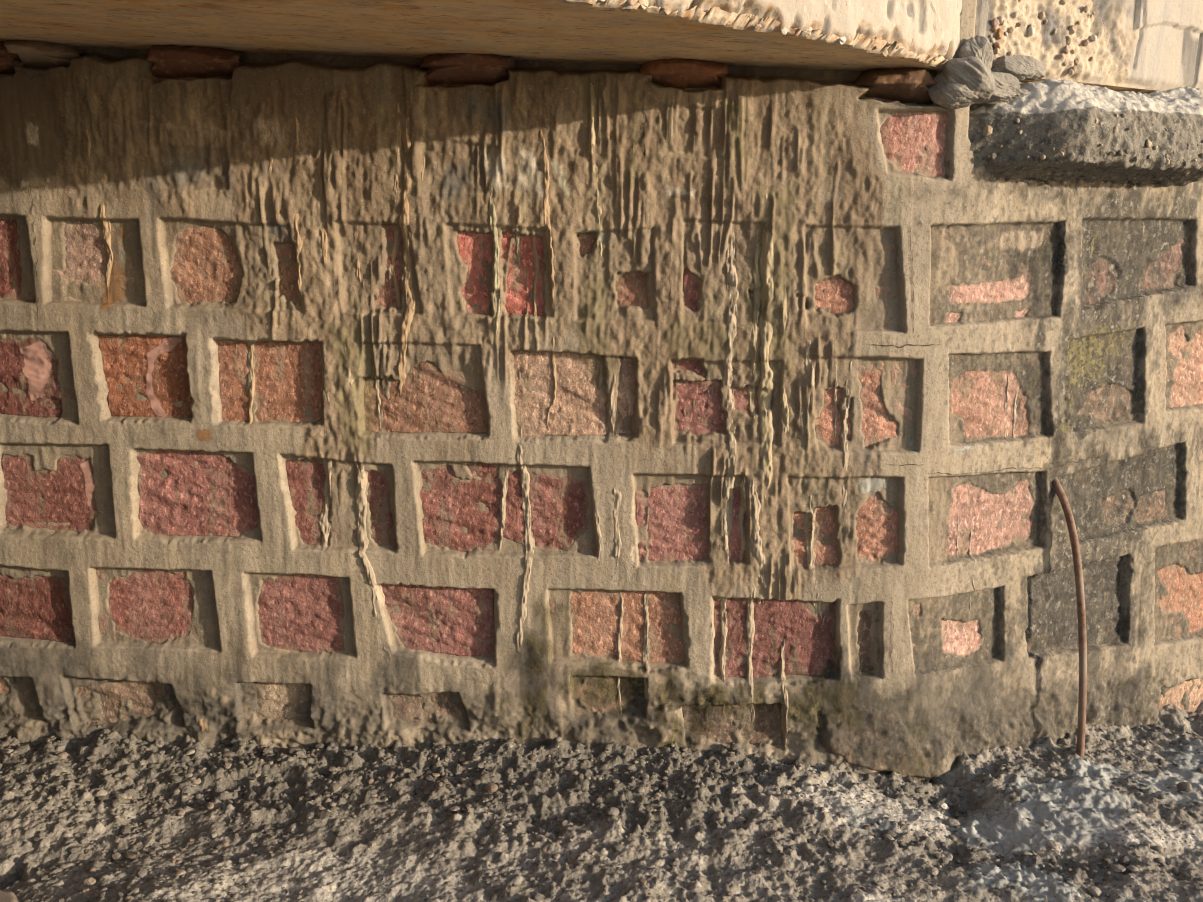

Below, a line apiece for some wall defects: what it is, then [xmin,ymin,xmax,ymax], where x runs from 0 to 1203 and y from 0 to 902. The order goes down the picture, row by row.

water stain [586,83,604,257]
water stain [99,201,113,296]
water stain [389,104,425,395]
water stain [486,129,568,430]
spalling [20,341,52,401]
spalling [80,460,94,506]
spalling [146,337,182,417]
water stain [319,458,332,550]
water stain [610,357,619,436]
water stain [723,186,789,722]
water stain [779,179,1203,779]
water stain [596,590,649,746]